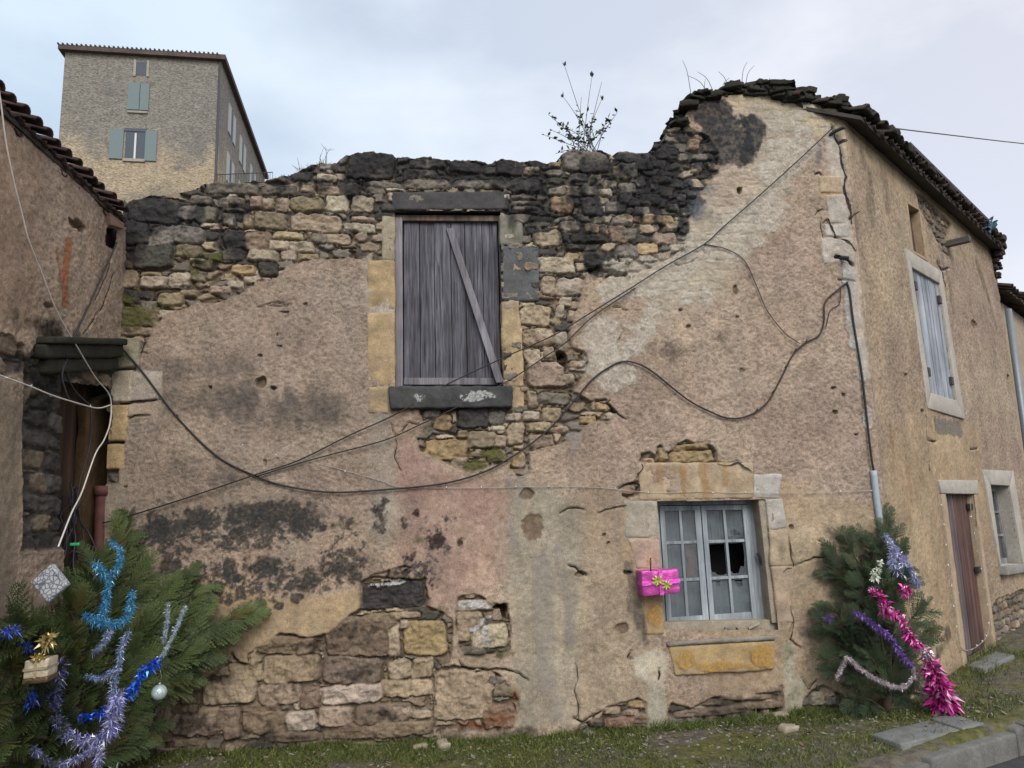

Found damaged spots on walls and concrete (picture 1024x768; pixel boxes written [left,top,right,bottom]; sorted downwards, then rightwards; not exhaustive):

leakage [123,195,251,272]
flaking render [120,125,720,501]
leakage [276,104,822,393]
crack [815,134,860,282]
flaking render [129,564,520,753]